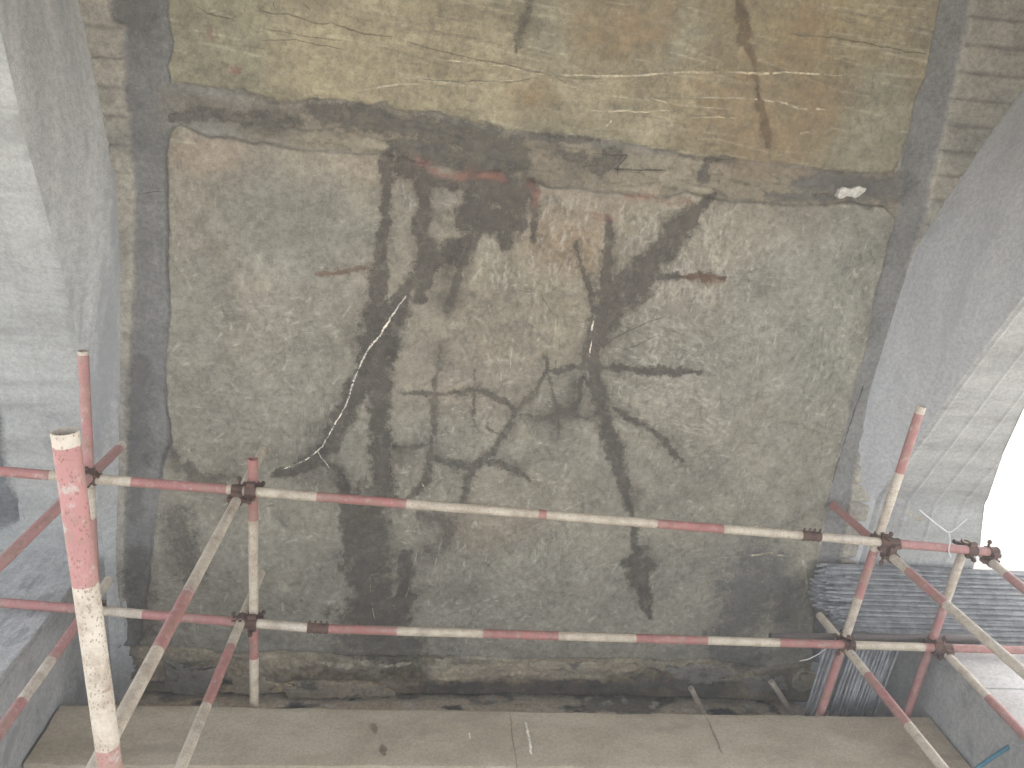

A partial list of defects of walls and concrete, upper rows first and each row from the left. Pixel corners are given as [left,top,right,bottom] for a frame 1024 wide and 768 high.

crack [407,41,535,83]
damp [767,171,917,205]
damp [168,98,735,681]
damp [160,505,207,583]
damp [119,544,161,640]